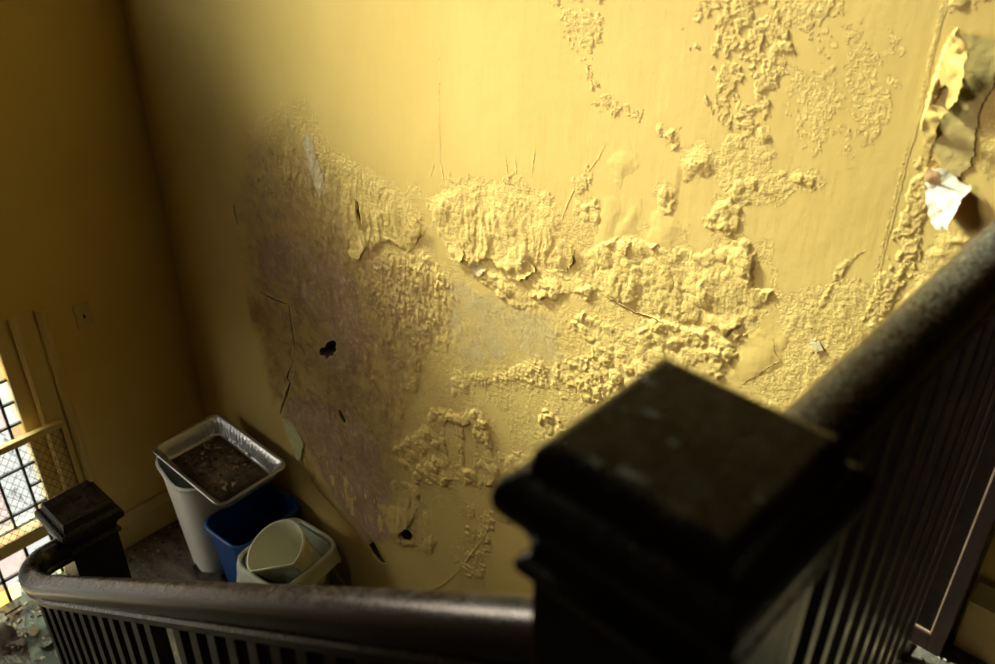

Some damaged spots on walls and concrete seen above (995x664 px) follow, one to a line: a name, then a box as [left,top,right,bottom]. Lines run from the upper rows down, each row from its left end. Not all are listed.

water stain [249,150,420,447]
peeling [548,0,643,123]
peeling [651,179,679,216]
peeling [688,0,905,207]
peeling [731,28,995,412]
peeling [941,0,986,15]
crack [260,290,363,540]